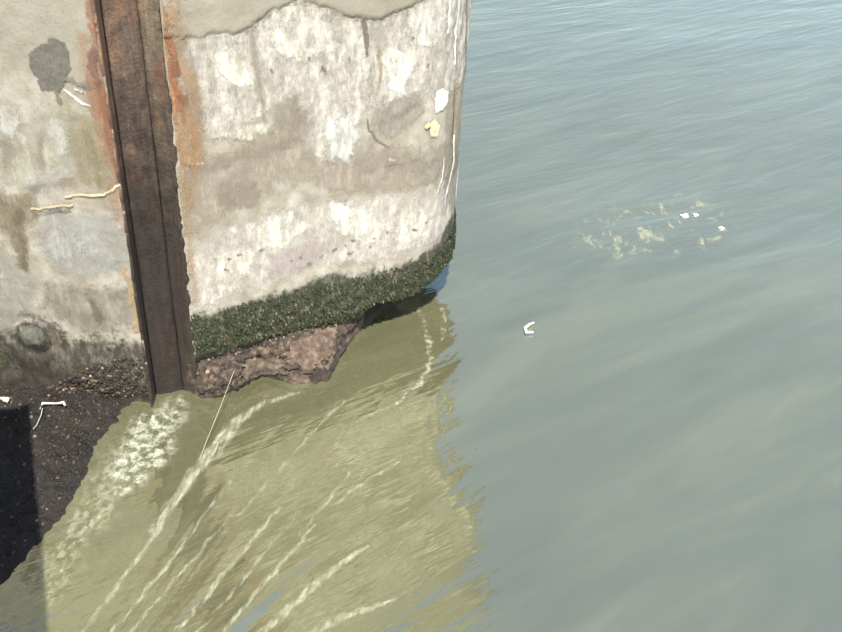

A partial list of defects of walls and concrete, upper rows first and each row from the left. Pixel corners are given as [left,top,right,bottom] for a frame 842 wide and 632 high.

damp [28,38,92,104]
crack [31,183,120,214]
corrosion [78,2,120,209]
corrosion [163,7,203,205]
peeling [179,0,471,310]